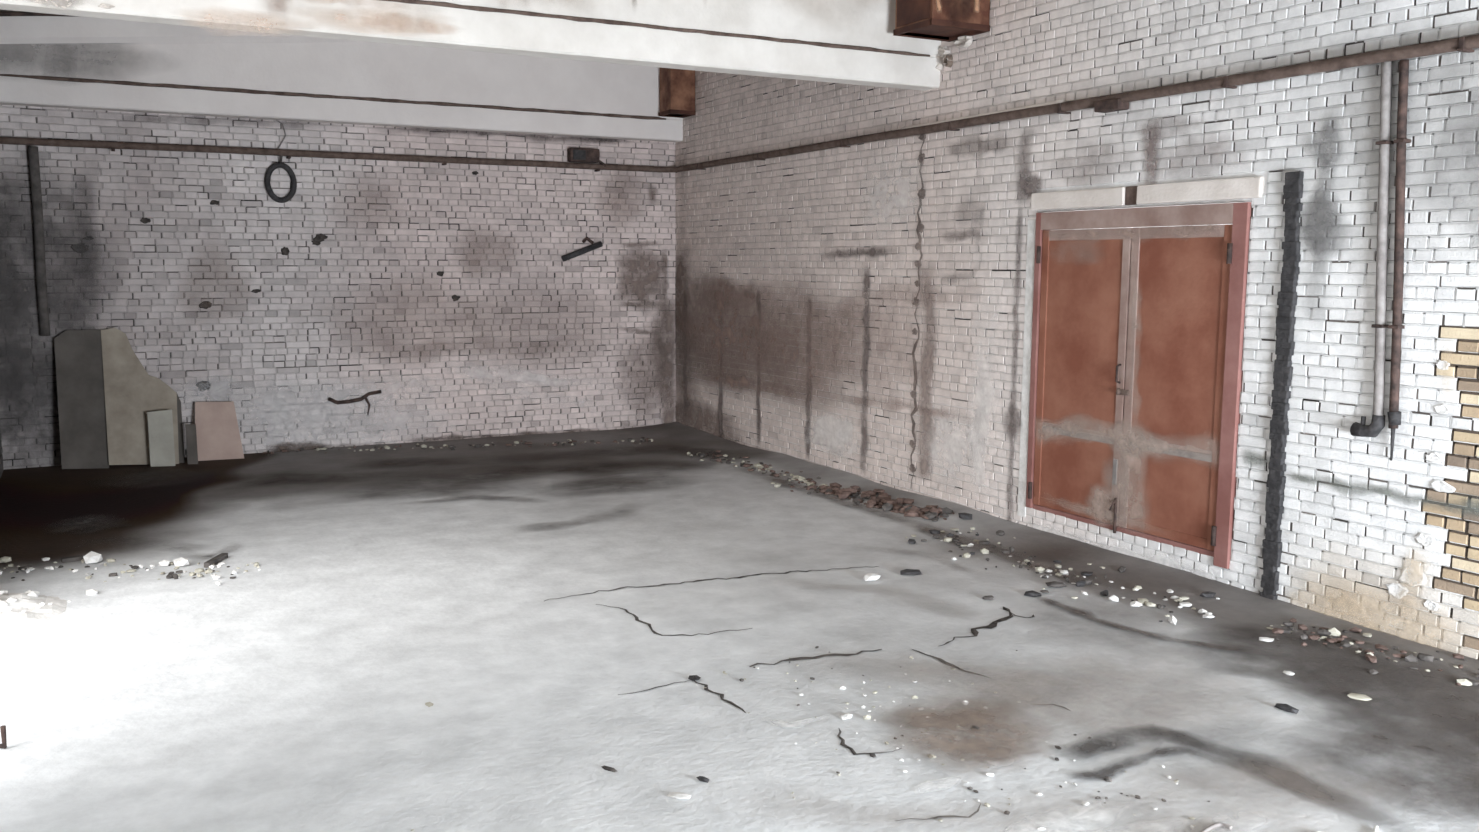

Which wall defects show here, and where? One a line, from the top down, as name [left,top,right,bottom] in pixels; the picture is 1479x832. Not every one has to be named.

damp [1303,123,1338,263]
damp [805,301,851,454]
crack [910,140,925,485]
damp [920,291,955,475]
damp [1012,218,1021,379]
damp [1007,397,1015,521]
flaking render [1386,325,1479,611]
crack [618,680,746,713]
crack [545,566,878,636]
crack [749,607,1034,678]
flaking render [1462,634,1479,660]